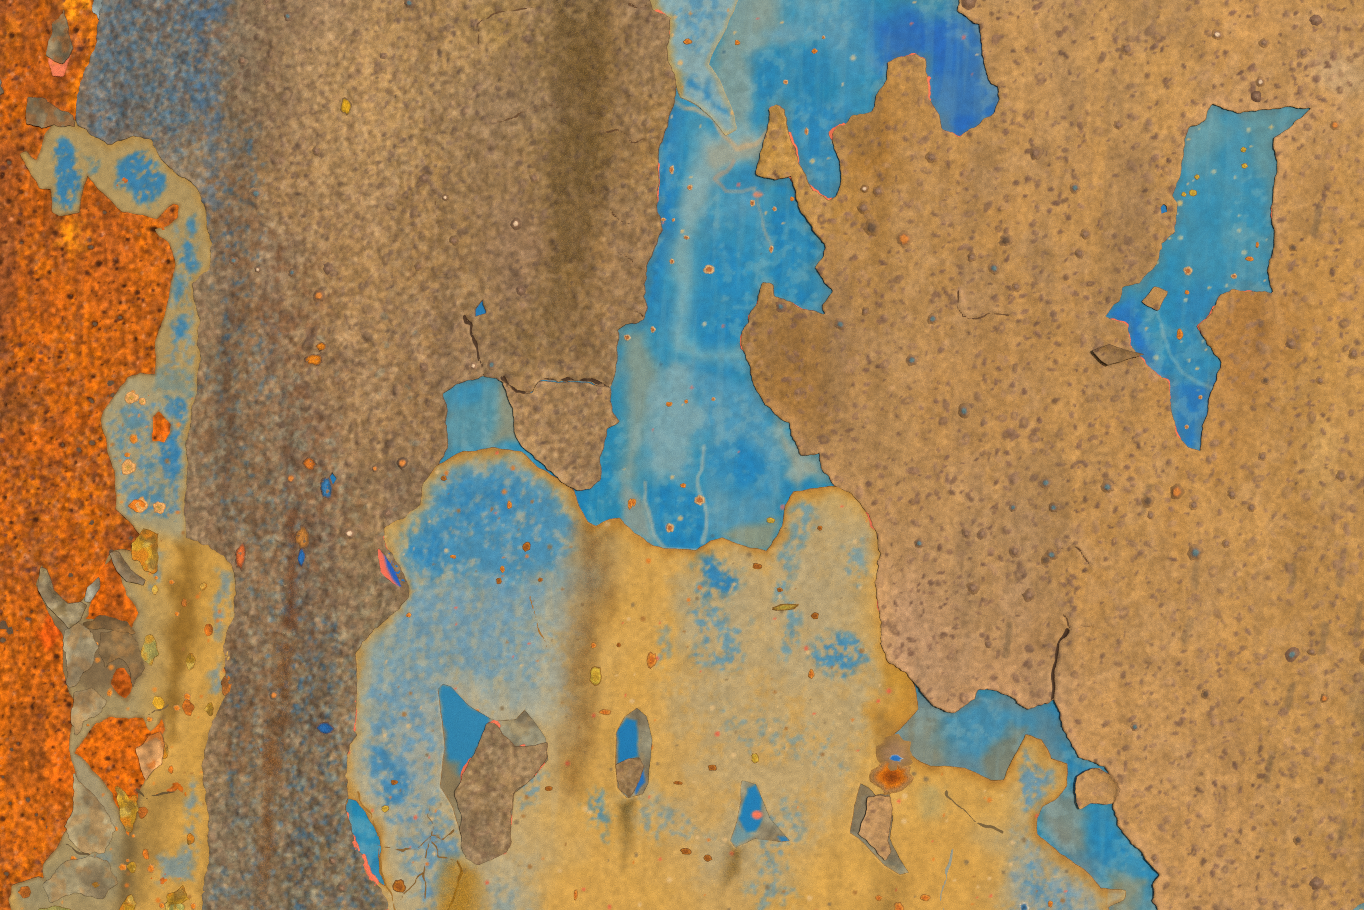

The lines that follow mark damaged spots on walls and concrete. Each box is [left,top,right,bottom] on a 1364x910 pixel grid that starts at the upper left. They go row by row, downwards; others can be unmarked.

corrosion [0,0,191,910]
peeling [9,120,247,910]
peeling [315,722,335,734]
peeling [340,97,352,116]
crack [463,315,609,394]
peeling [345,0,1159,910]
crack [1051,614,1090,700]
peeling [1093,105,1309,451]